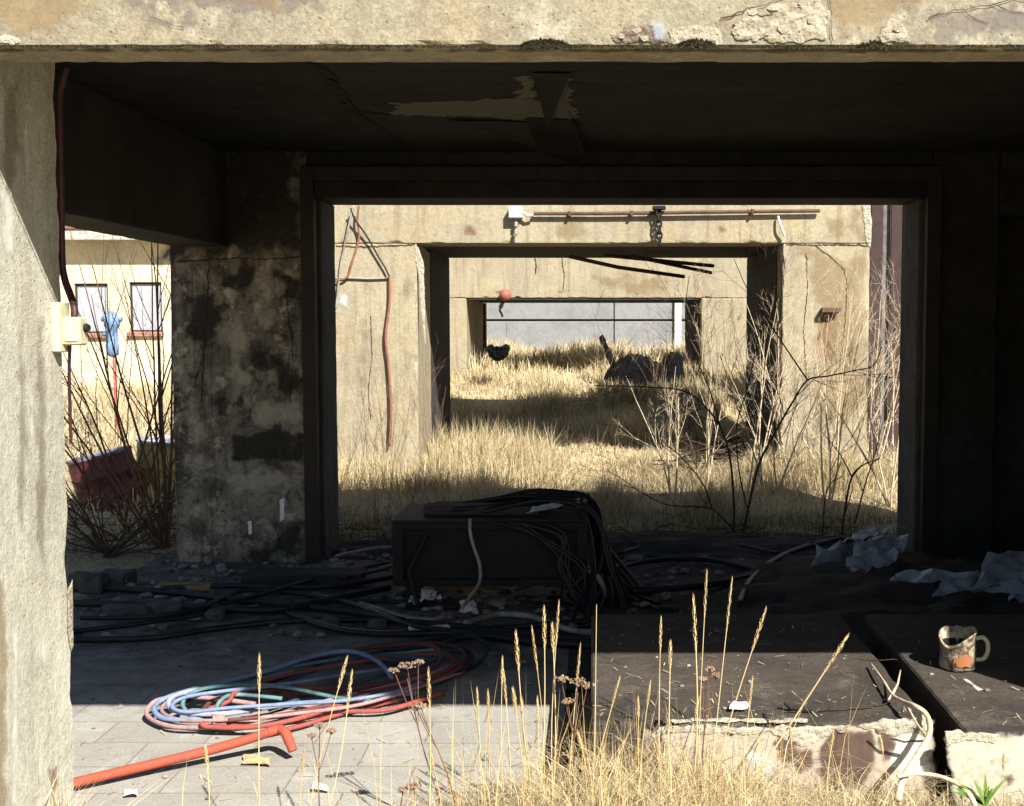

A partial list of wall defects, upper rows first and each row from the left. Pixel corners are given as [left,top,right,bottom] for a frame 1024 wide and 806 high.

spalling [611,0,832,45]
spalling [878,17,911,42]
crack [309,64,410,152]
peeling [388,78,586,166]
leakage [185,267,256,347]
crack [176,256,301,403]
leakage [273,271,301,302]
leakage [252,352,303,400]
leakage [232,429,304,461]